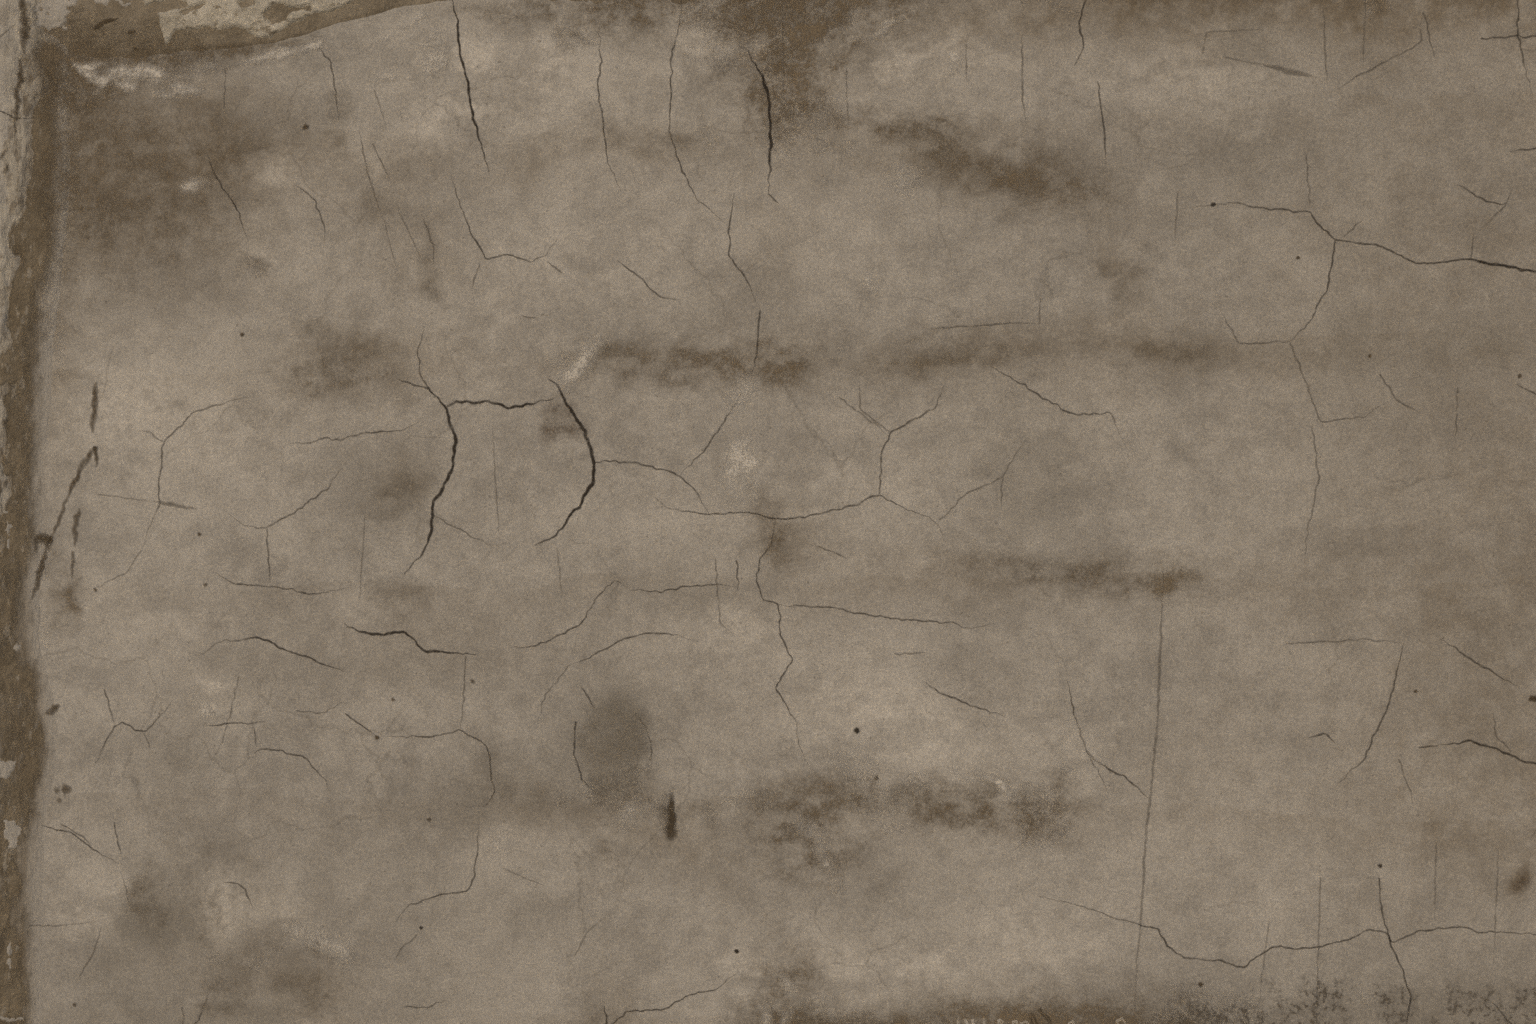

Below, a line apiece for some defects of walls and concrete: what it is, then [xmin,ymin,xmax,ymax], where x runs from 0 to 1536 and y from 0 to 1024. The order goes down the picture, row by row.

crack [452,0,488,166]
crack [748,51,773,177]
crack [1250,206,1534,315]
water stain [600,341,808,385]
spalling [0,0,354,1024]
crack [408,355,926,567]
crack [350,627,468,654]
crack [648,557,792,715]
crack [1426,740,1536,764]
water stain [774,777,860,870]
water stain [851,982,1345,1024]
crack [1214,878,1493,1010]